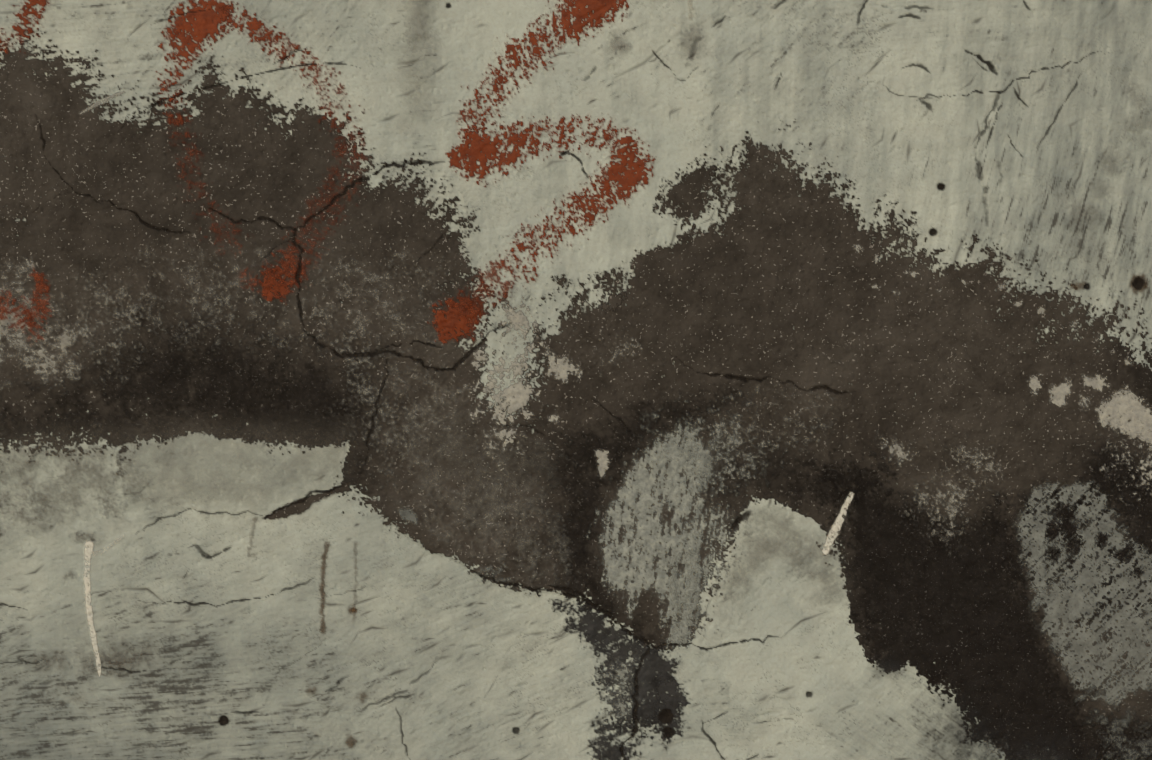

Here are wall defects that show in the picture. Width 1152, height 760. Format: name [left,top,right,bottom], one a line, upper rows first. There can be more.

crack [561,150,588,177]
crack [210,160,503,459]
crack [704,373,847,394]
crack [268,487,339,517]
crack [475,572,772,760]